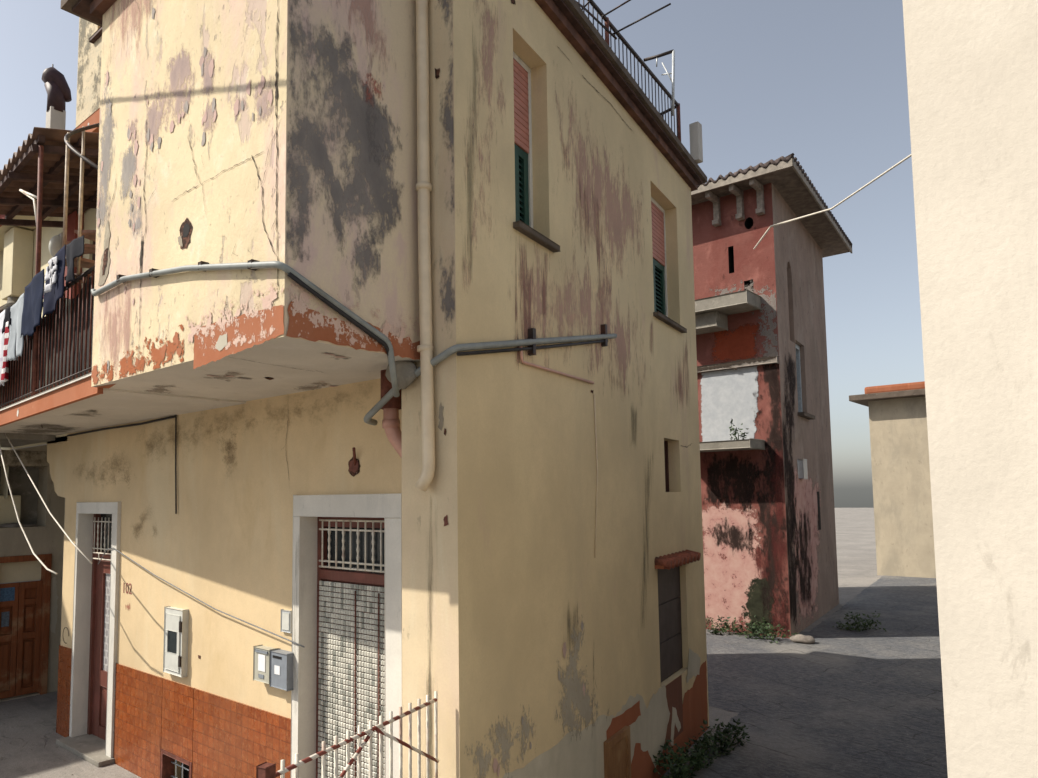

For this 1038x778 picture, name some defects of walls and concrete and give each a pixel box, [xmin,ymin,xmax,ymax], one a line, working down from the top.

damp [77,18,114,235]
crack [138,0,278,362]
damp [286,0,401,285]
spalling [91,282,420,385]
crack [697,356,775,372]
peeling [702,499,776,636]
damp [706,356,813,636]
peeling [467,621,681,778]